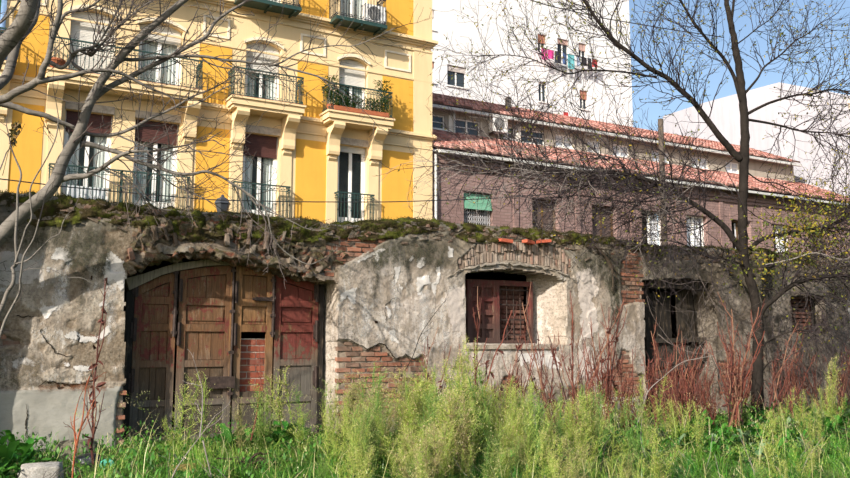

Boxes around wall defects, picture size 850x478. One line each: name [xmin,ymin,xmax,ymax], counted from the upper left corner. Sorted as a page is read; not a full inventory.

peeling [0,247,73,286]
crack [16,315,82,357]
peeling [64,325,111,343]
spalling [102,219,391,290]
peeling [409,255,465,334]
flaking render [448,242,599,378]
flaking render [620,249,645,306]
flaking render [334,341,435,418]
flaking render [605,351,643,397]